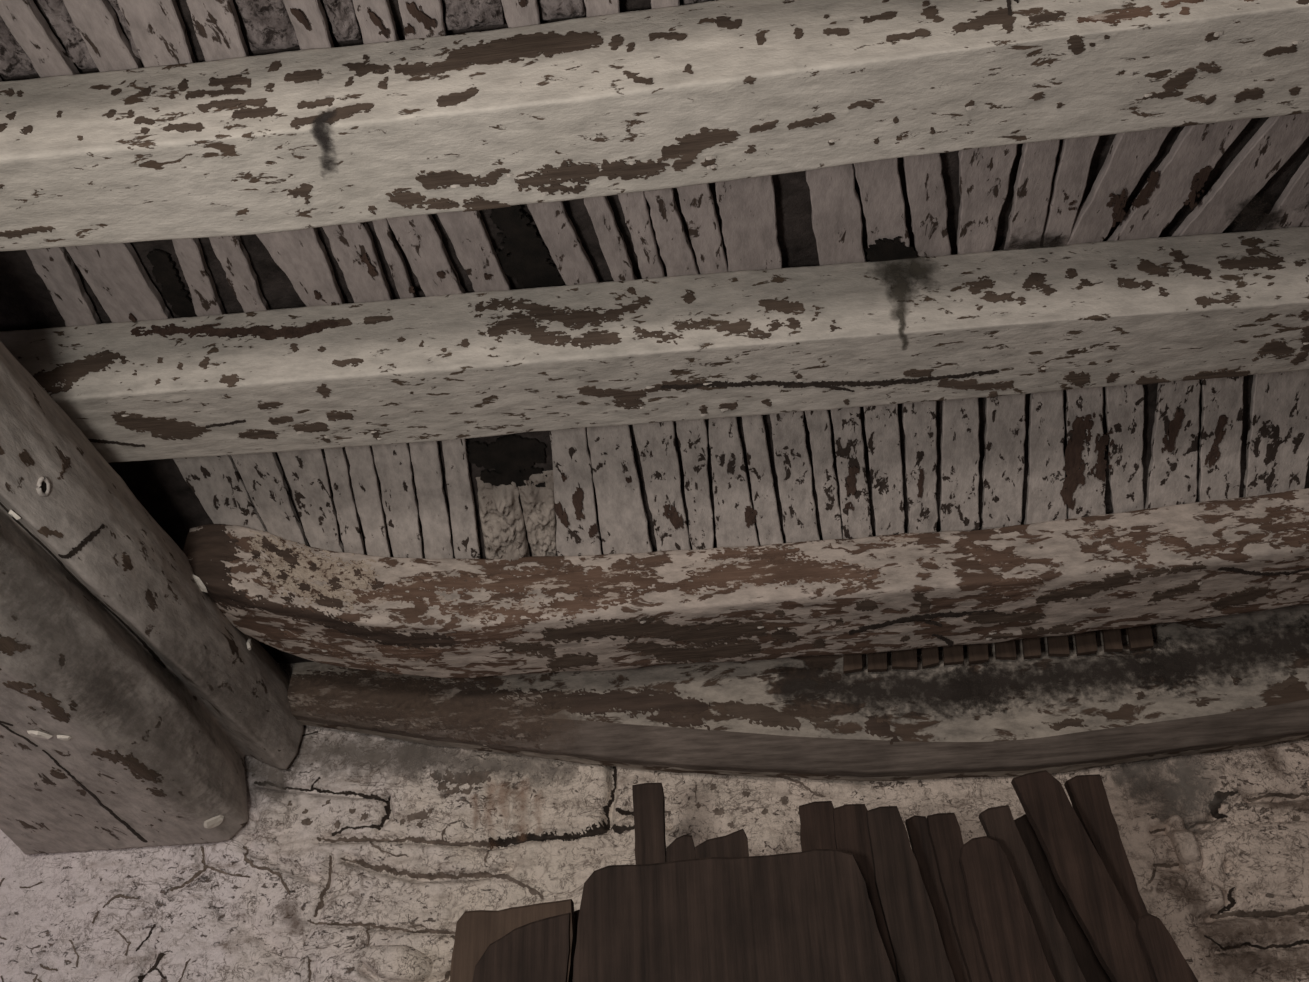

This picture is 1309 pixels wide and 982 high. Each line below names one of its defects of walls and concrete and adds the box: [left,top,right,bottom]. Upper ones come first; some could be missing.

peeling [106,61,324,135]
water stain [312,111,335,170]
peeling [290,31,687,130]
peeling [368,100,874,215]
peeling [474,287,842,349]
water stain [875,258,931,350]
peeling [183,524,881,749]
crack [170,766,634,946]
crack [1148,790,1309,884]
crack [0,894,191,982]
crack [306,959,314,982]
crack [1204,887,1309,951]